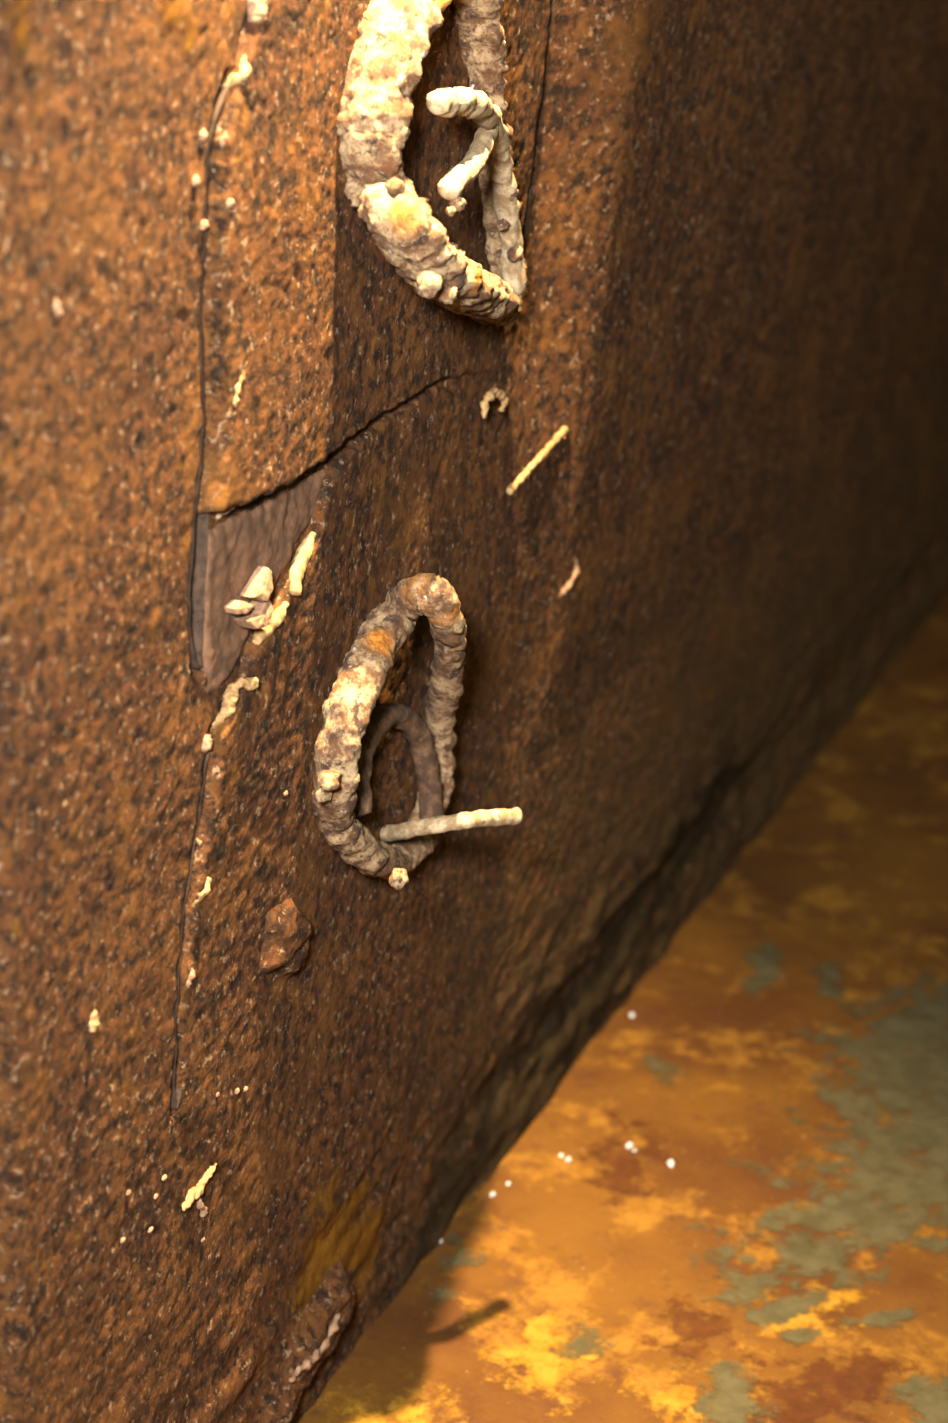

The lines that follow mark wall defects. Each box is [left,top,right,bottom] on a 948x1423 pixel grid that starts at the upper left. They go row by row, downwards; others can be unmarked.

spalling [480,387,509,419]
flaking render [506,426,571,559]
spalling [201,469,325,693]
crack [170,0,438,1109]
spalling [557,558,580,598]
rust [583,1112,667,1205]
rust [343,1390,458,1423]
rust [480,1311,599,1414]
rust [620,1380,703,1423]
rust [669,1300,730,1366]
rust [761,1285,865,1338]
rust [745,1348,906,1423]